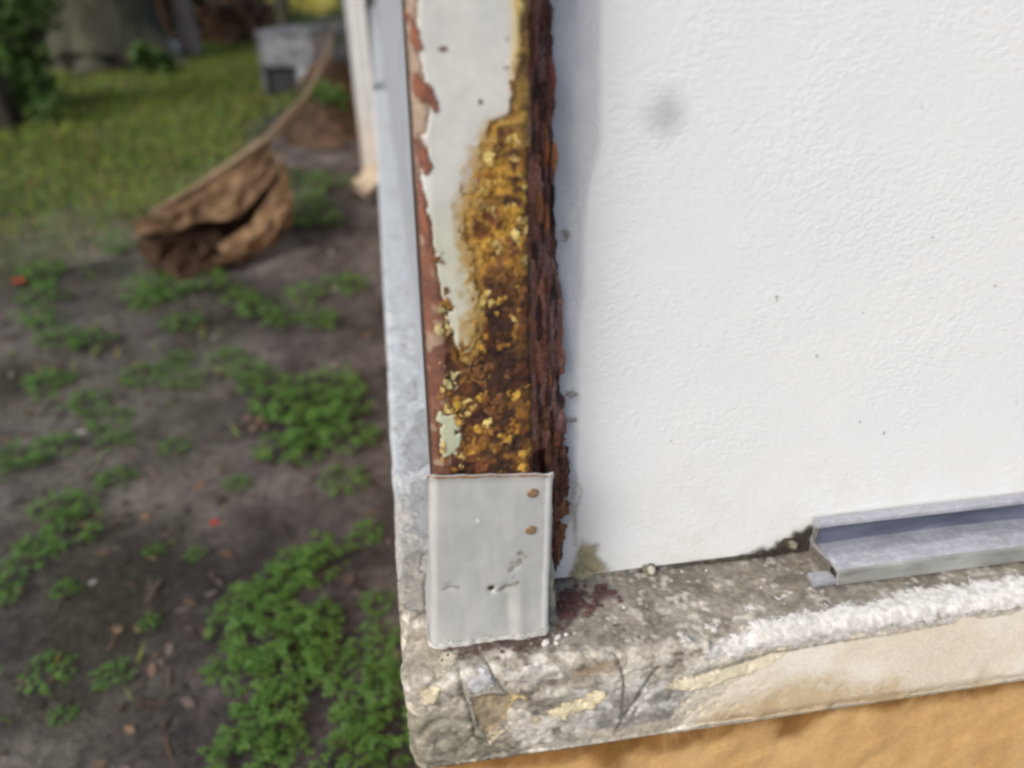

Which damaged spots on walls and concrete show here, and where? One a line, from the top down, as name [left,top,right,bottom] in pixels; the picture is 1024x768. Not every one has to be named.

peeling [398,0,549,713]
corrosion [427,0,571,572]
corrosion [557,587,617,631]